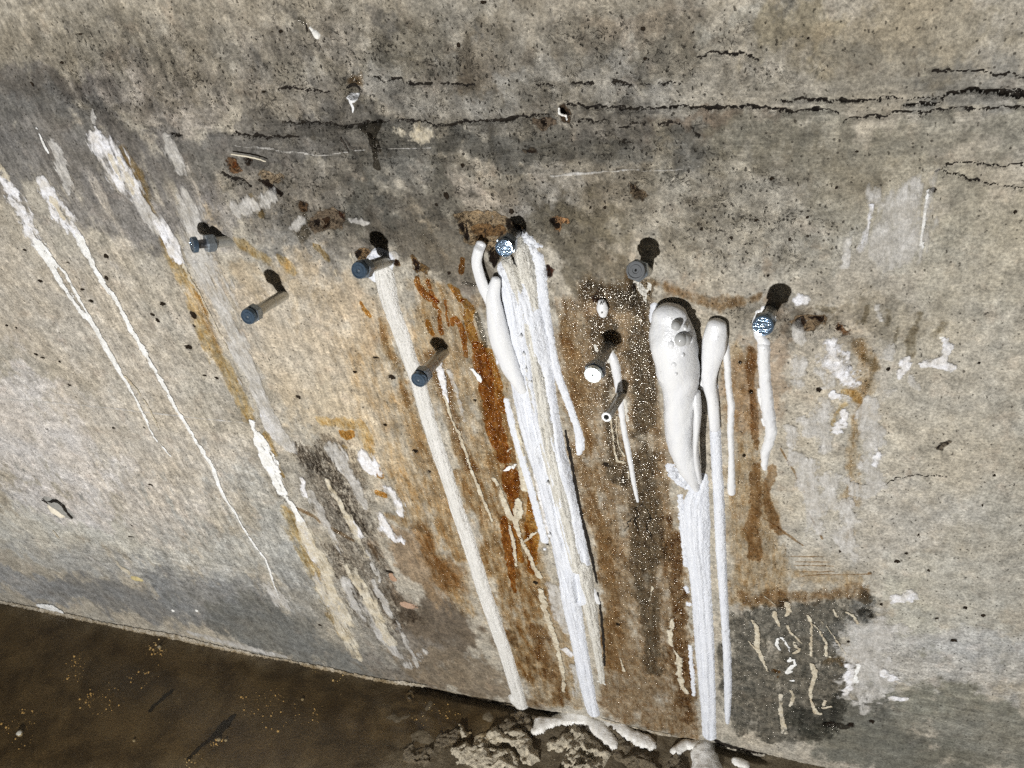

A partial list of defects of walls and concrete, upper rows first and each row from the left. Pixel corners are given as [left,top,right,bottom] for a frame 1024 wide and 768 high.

leakage [0,166,172,457]
leakage [36,127,290,609]
crack [220,171,252,187]
leakage [86,109,428,668]
corrosion [414,276,538,593]
leakage [491,424,579,705]
leakage [560,282,690,694]
crack [232,68,1024,144]
crack [697,51,759,62]
leakage [717,587,918,744]
crack [934,161,1024,190]